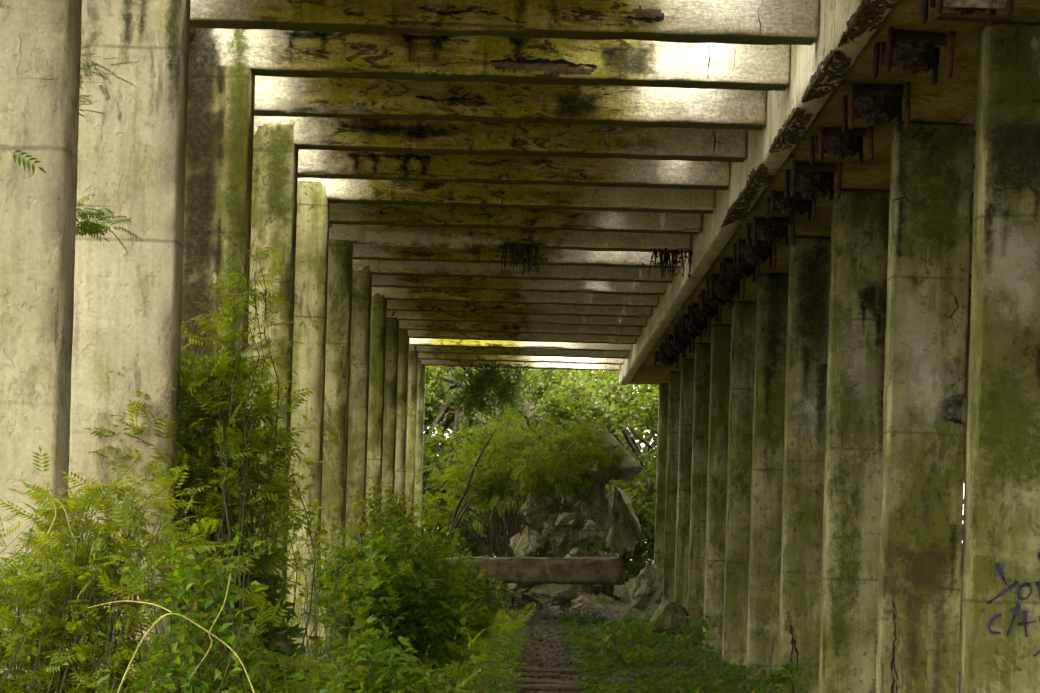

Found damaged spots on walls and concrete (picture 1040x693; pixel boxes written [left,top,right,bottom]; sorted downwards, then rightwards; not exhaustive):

water stain [285,31,333,61]
water stain [403,34,448,61]
water stain [602,44,653,75]
water stain [312,105,469,139]
spalling [721,0,898,228]
water stain [168,28,225,386]
crack [790,619,799,693]
water stain [832,596,843,657]
crack [890,602,899,693]
water stain [900,525,958,691]